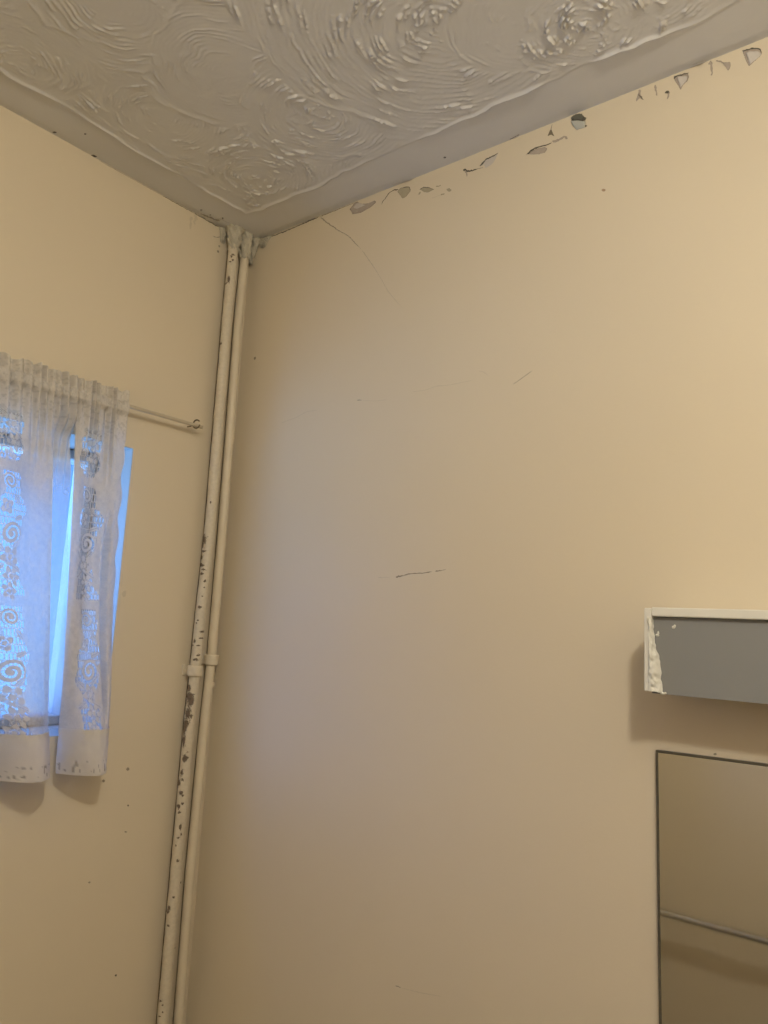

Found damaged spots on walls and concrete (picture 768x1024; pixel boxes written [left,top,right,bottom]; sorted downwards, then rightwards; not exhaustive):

peeling [743,48,762,66]
peeling [654,60,730,99]
peeling [526,114,587,155]
peeling [351,179,451,214]